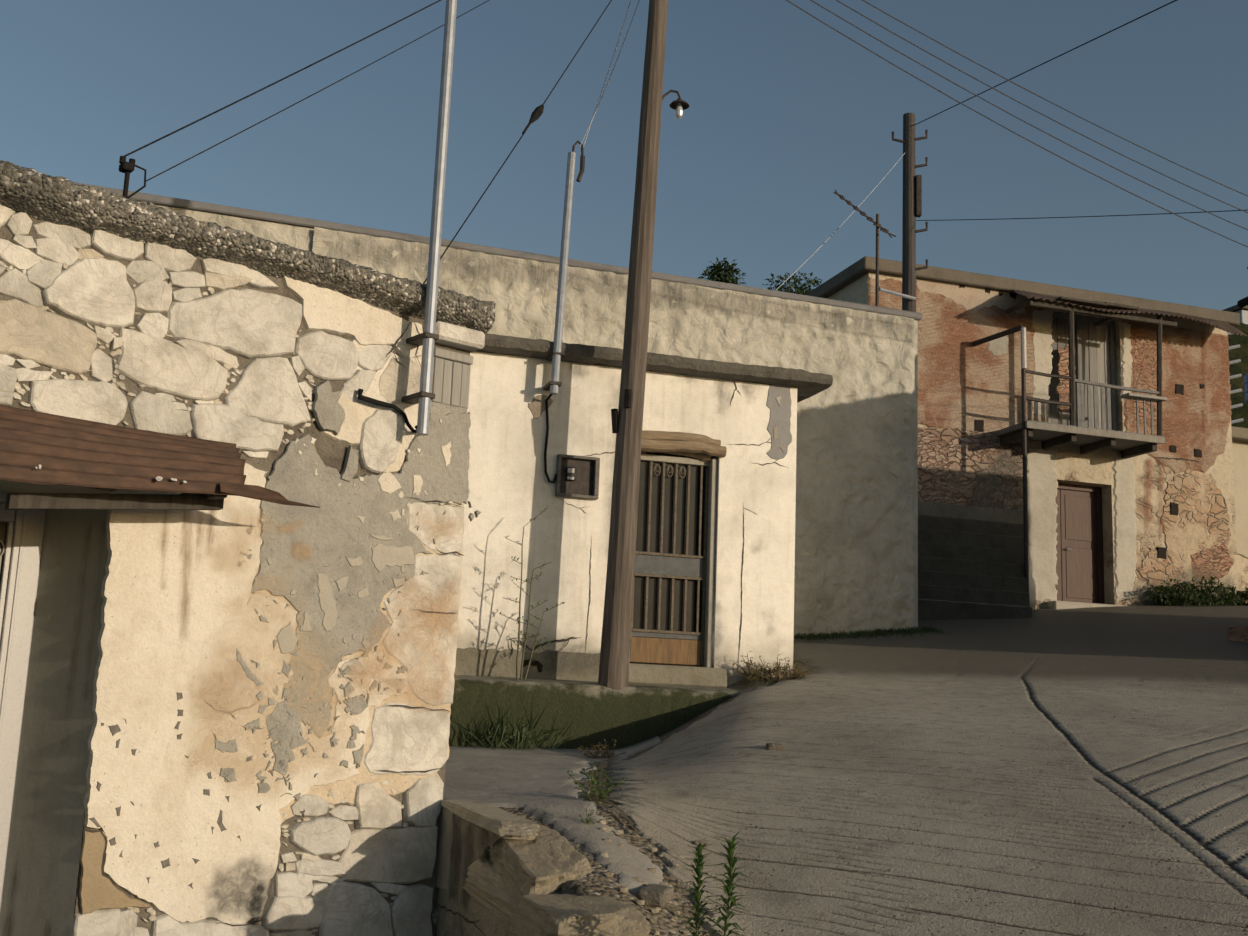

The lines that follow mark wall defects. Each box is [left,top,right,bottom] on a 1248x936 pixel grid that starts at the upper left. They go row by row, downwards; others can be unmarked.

flaking render [528,395,553,419]
peeling [203,380,481,841]
spalling [523,659,543,672]
spalling [101,718,137,756]
spalling [175,692,184,740]
flaking render [79,817,149,915]